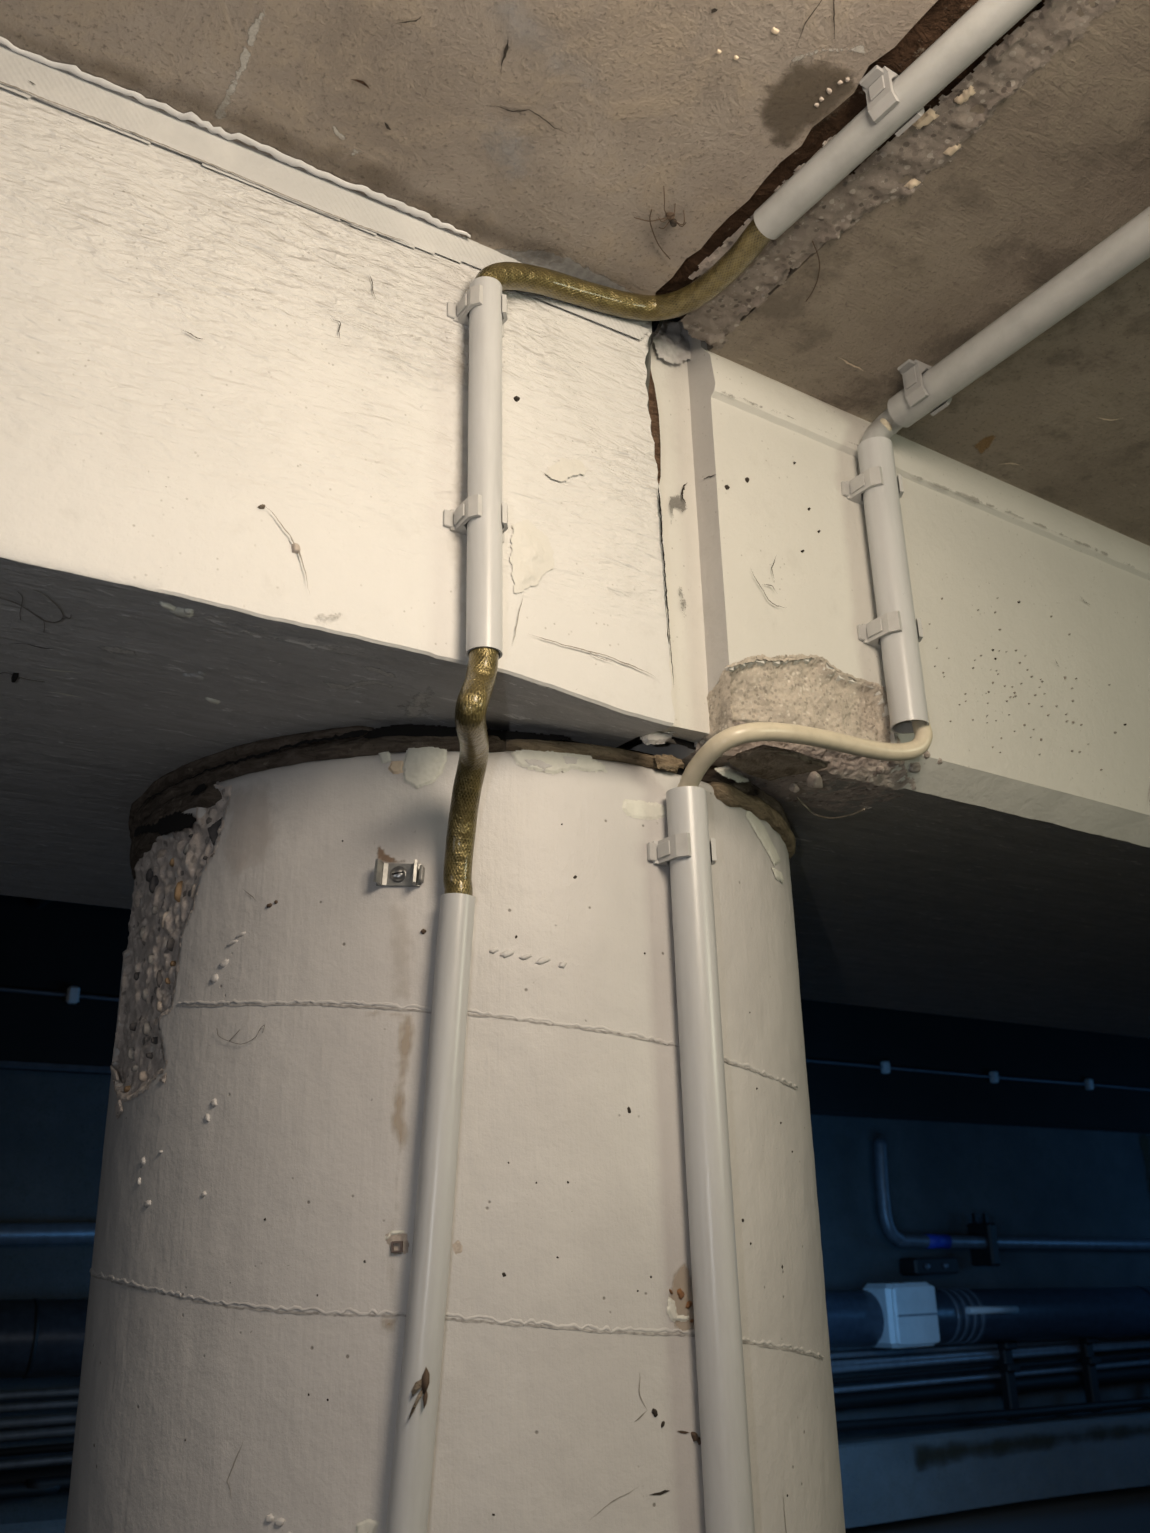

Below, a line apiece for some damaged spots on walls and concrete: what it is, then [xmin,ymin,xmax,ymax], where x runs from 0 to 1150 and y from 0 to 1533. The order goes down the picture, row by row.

water stain [764,45,866,145]
crack [798,0,835,42]
spalling [680,0,1121,350]
crack [136,729,370,813]
spalling [681,654,943,813]
spalling [110,781,232,1118]